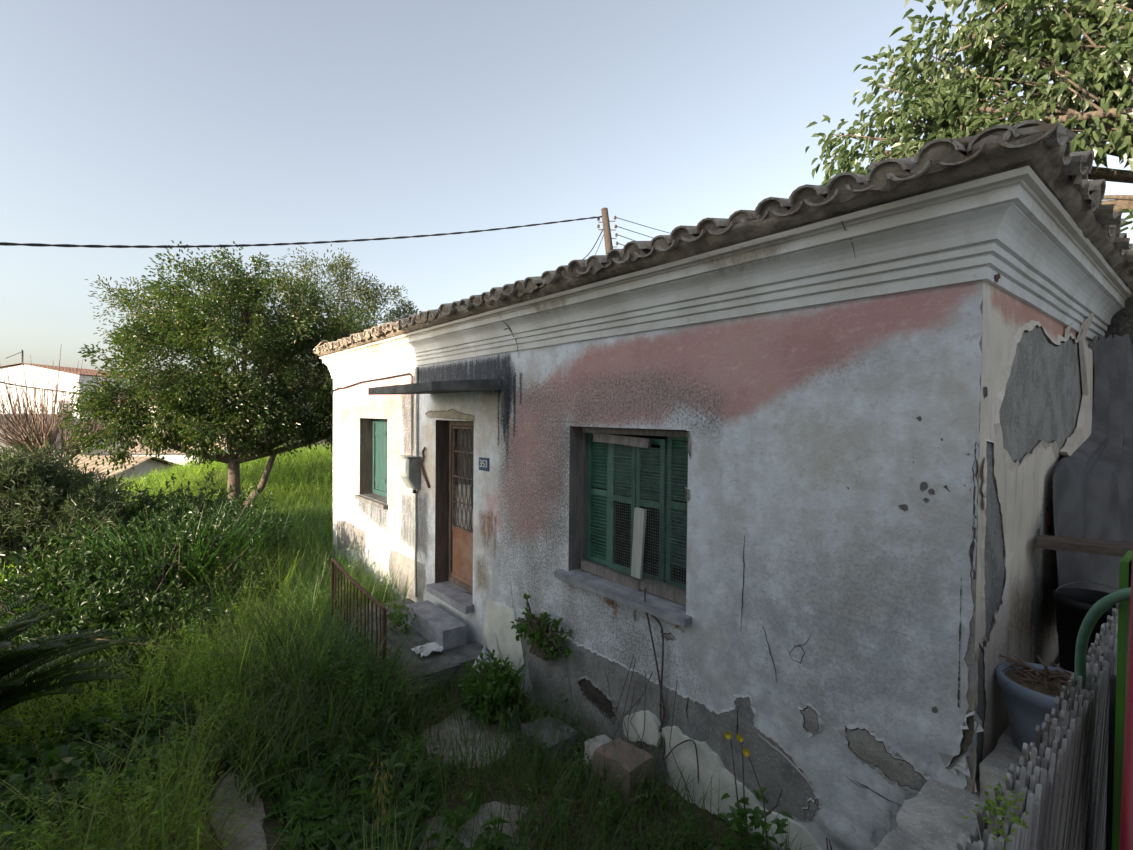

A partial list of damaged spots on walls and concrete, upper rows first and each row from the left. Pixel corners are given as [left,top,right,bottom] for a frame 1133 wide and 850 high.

leakage [402,354,522,459]
crack [740,535,811,673]
crack [955,579,963,708]
spalling [920,311,1095,792]
spalling [484,599,823,850]
spalling [797,702,932,795]